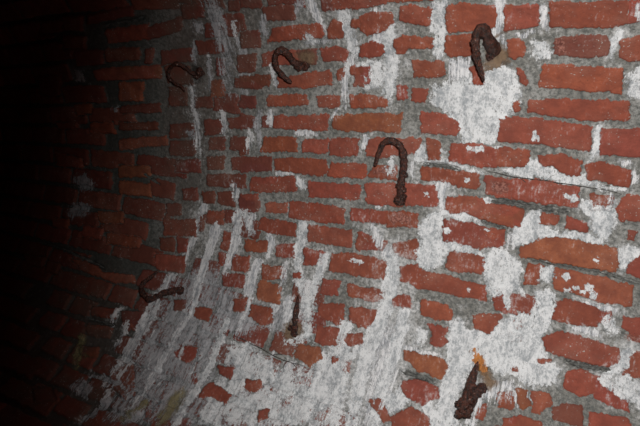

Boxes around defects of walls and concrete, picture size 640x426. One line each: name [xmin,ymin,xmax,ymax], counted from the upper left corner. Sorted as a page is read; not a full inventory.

water stain [259,13,270,40]
water stain [185,0,251,157]
water stain [429,0,522,153]
rust [483,47,510,71]
water stain [243,109,274,155]
water stain [294,129,318,137]
water stain [589,124,603,162]
crack [488,171,620,194]
water stain [67,157,640,426]
rust [470,348,497,390]